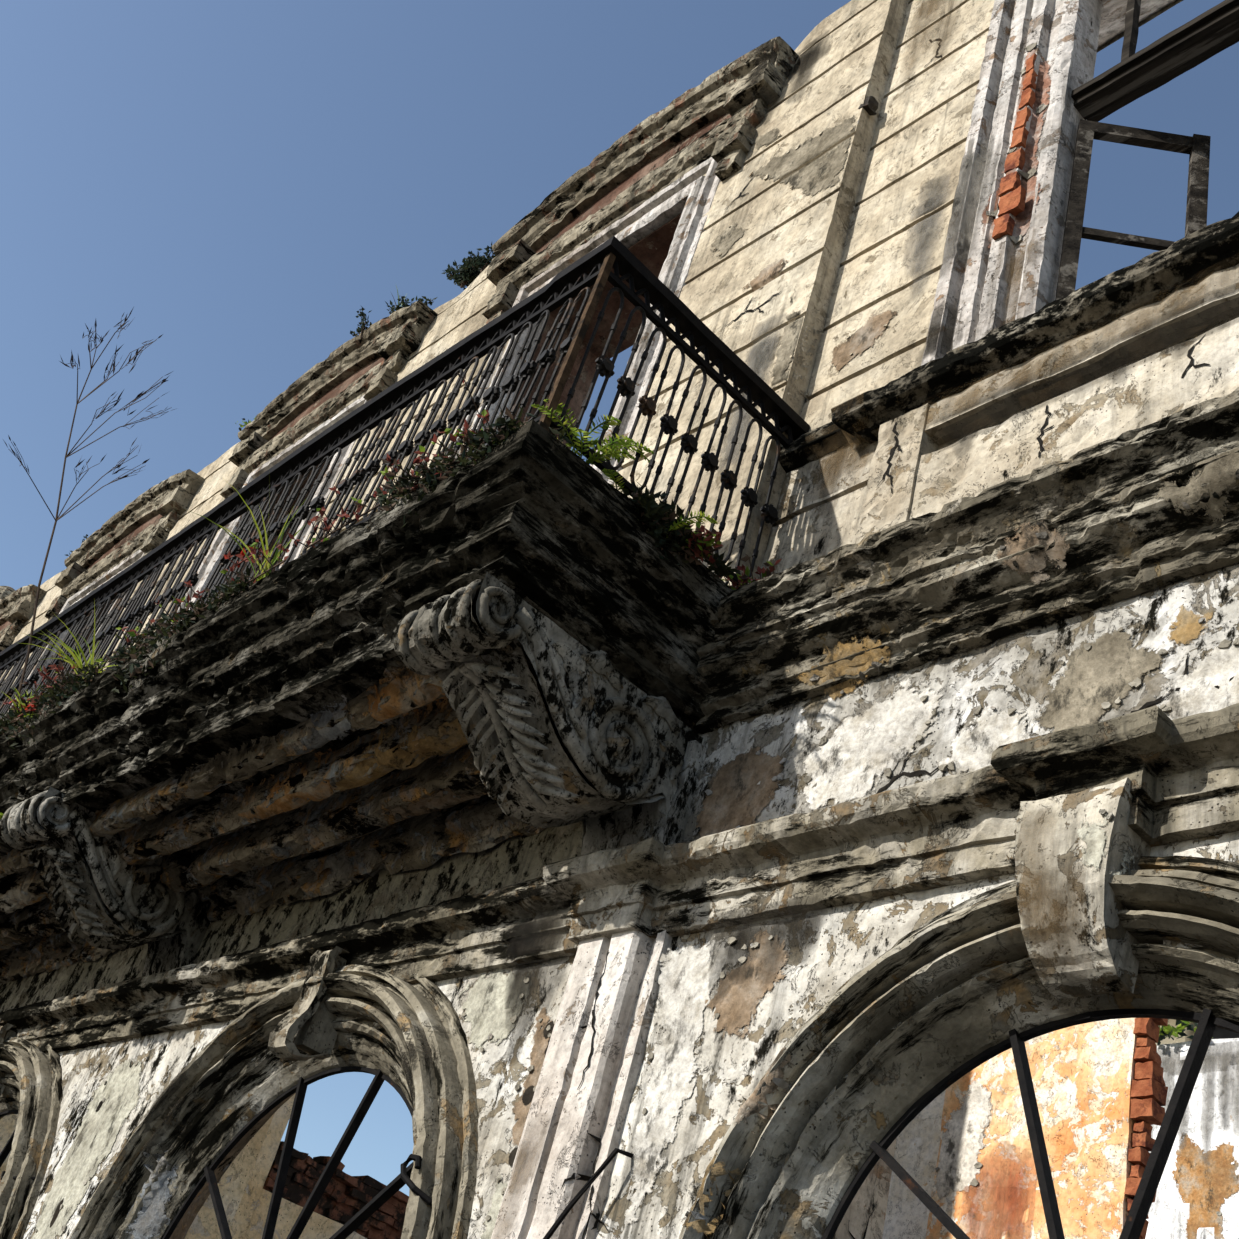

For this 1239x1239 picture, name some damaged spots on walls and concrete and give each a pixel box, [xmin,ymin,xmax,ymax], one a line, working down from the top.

flaking render [981,43,1051,248]
crack [1181,335,1210,378]
crack [877,422,902,493]
crack [1036,404,1054,457]
peeling [796,636,892,700]
peeling [937,605,1239,775]
peeling [693,746,786,837]
peeling [803,678,943,811]
peeling [1077,809,1135,875]
leakage [512,911,556,1030]
crack [577,950,609,1089]
crack [561,1132,608,1239]